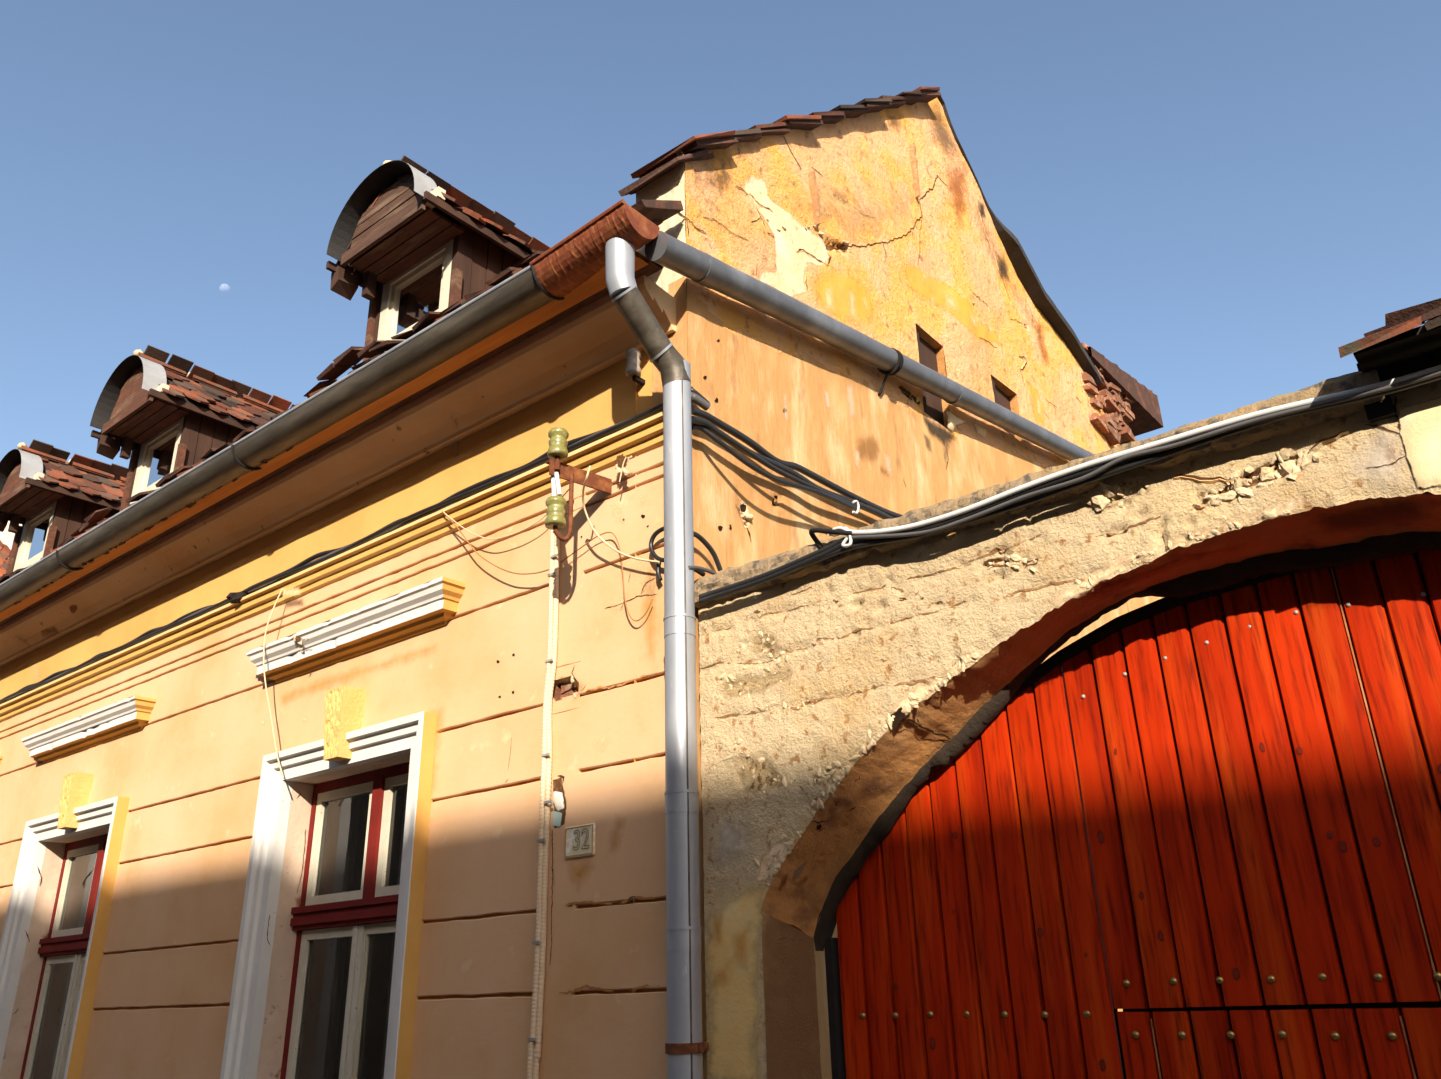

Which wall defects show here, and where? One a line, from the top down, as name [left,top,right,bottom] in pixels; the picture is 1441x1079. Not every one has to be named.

flaking render [742,176,851,297]
crack [848,175,948,261]
spalling [983,554,1038,574]
spalling [1055,448,1319,604]
crack [715,676,951,741]